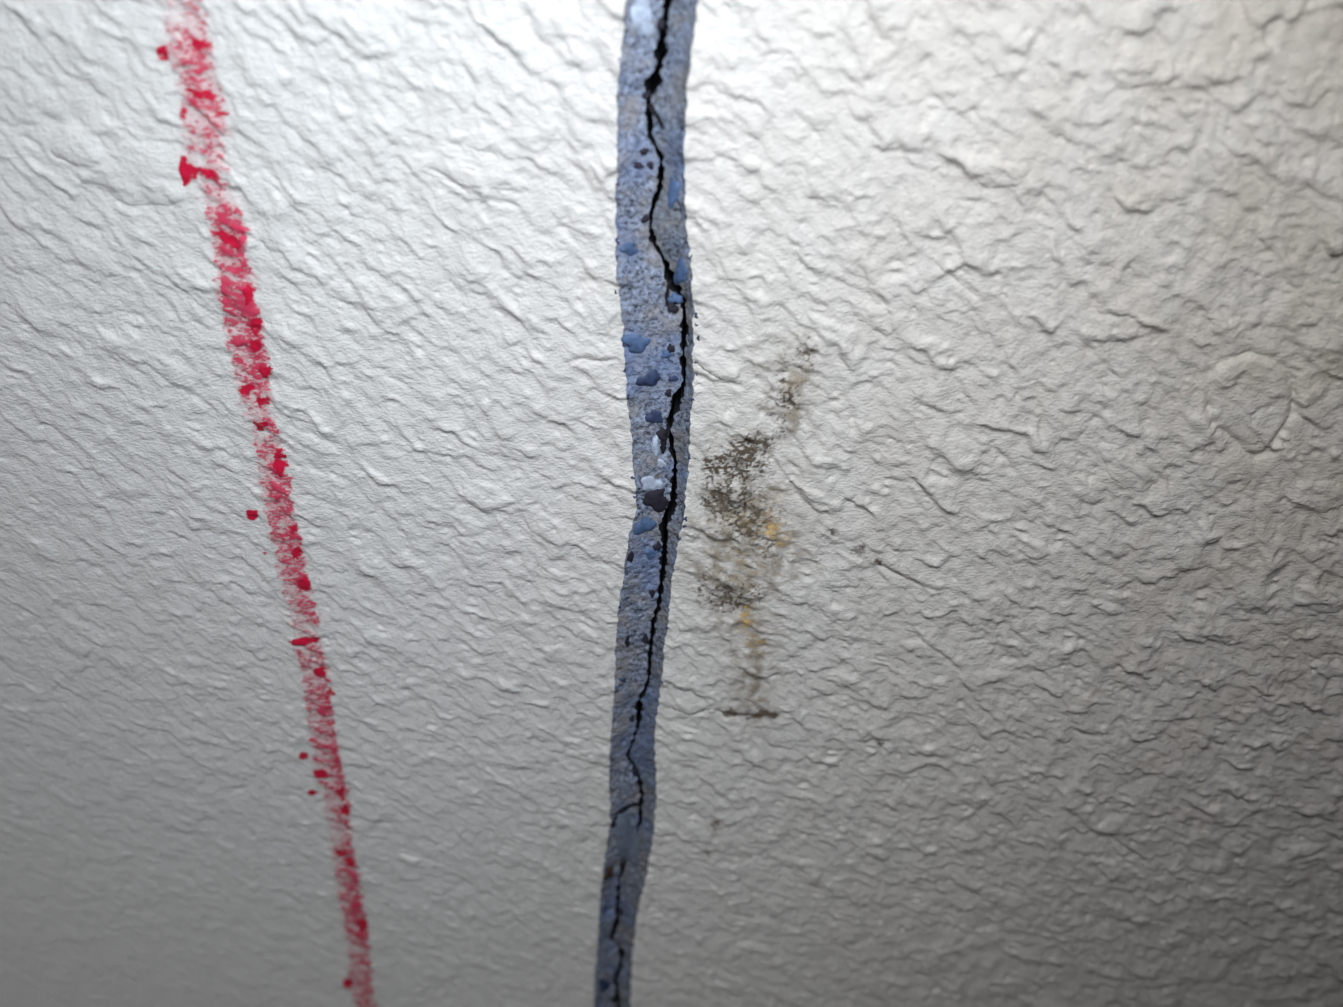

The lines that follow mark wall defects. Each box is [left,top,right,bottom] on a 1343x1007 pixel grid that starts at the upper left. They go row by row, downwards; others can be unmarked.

crack [593,0,747,1007]
damp [696,478,795,600]
damp [722,620,778,720]